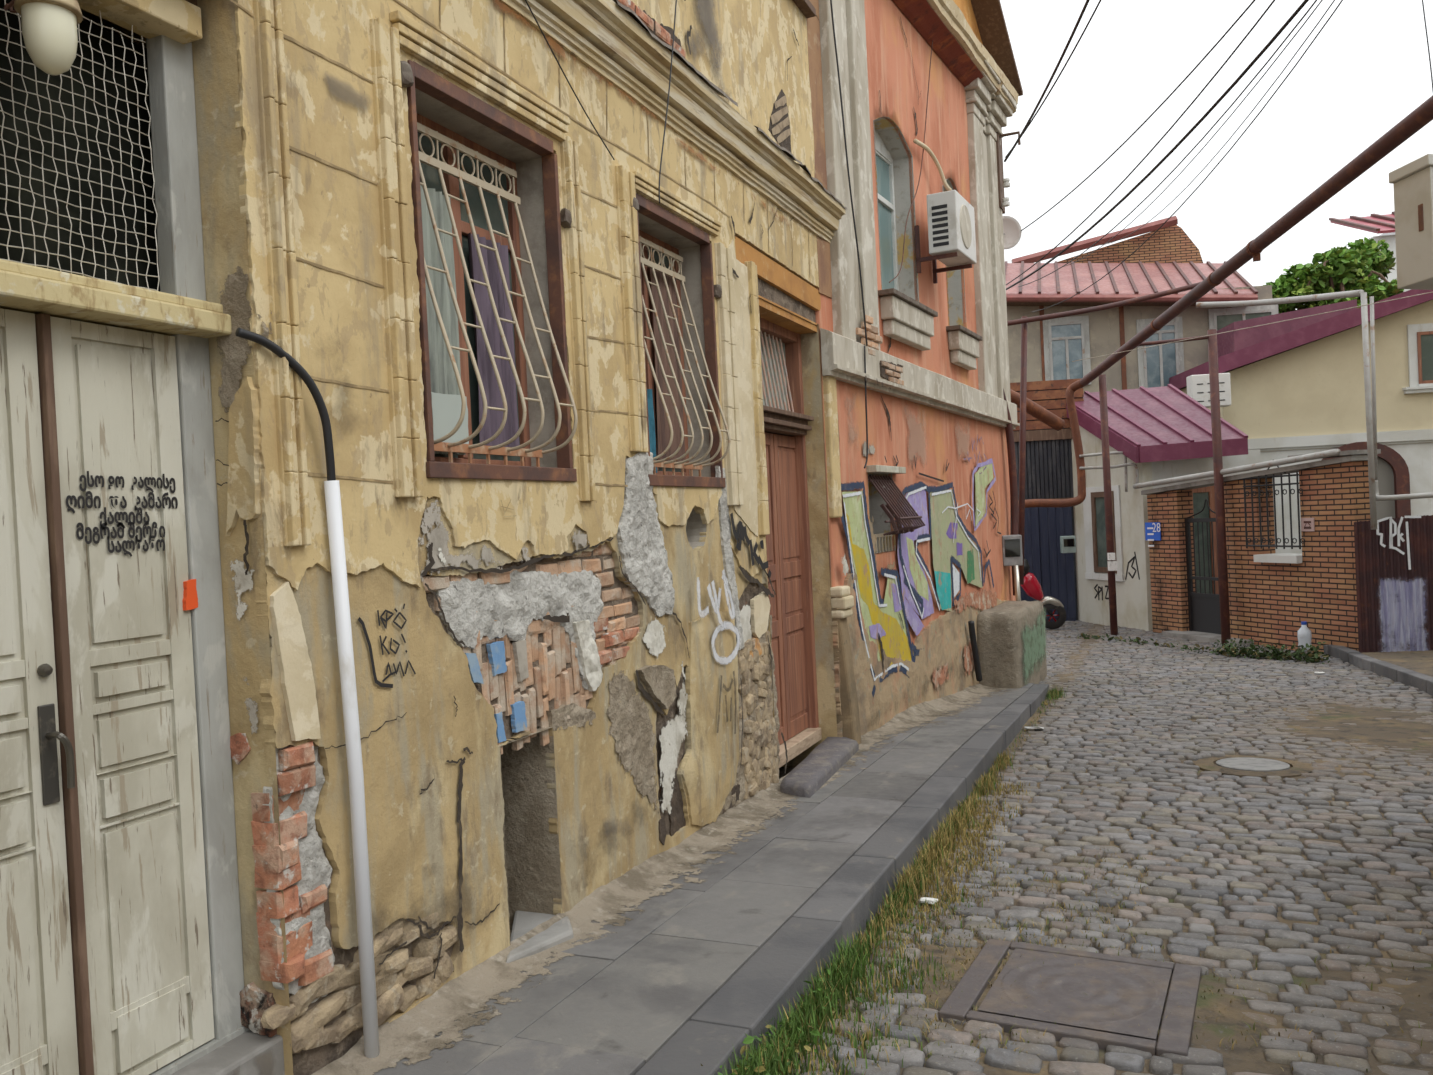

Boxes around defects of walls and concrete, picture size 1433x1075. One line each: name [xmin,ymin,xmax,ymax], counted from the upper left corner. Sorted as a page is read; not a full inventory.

flaking render [217,266,273,536]
flaking render [230,559,255,621]
spalling [230,677,258,765]
flaking render [239,582,459,1054]
crack [325,712,407,749]
crack [379,696,500,979]
flaking render [418,499,688,814]